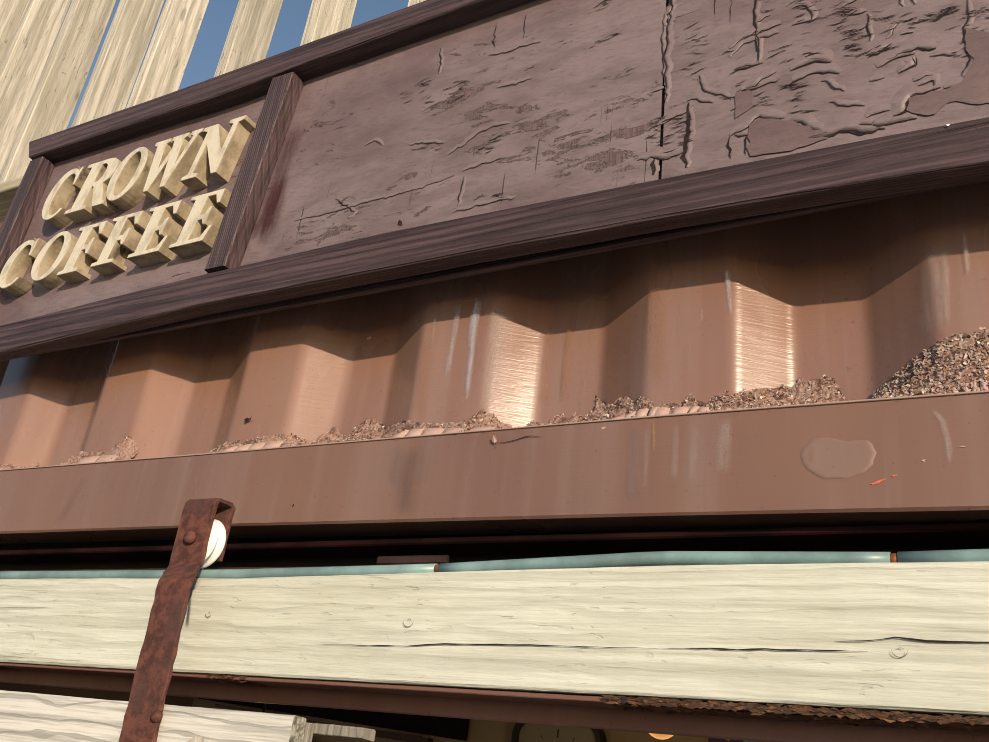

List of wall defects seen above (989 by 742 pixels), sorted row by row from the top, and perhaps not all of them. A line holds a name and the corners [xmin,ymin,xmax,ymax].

crack [489,17,541,55]
crack [497,76,532,88]
crack [604,0,989,175]
crack [294,47,516,221]
crack [327,619,989,658]